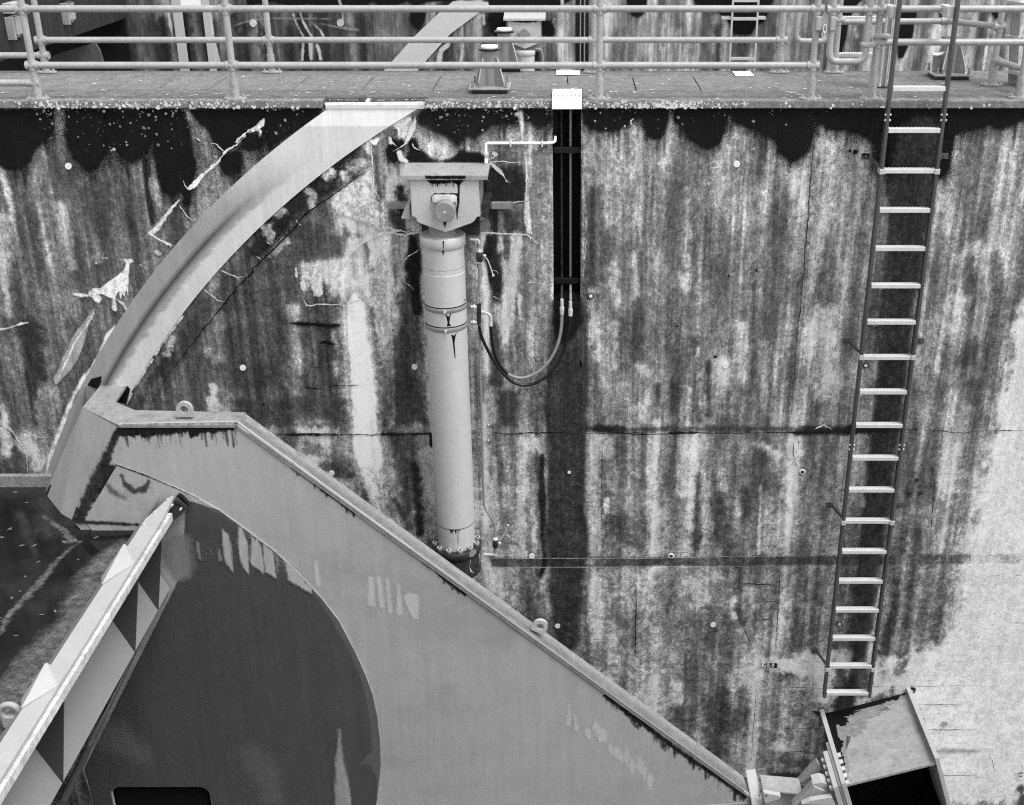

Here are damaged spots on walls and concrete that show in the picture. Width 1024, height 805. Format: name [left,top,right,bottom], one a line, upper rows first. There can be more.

leakage [0,108,322,224]
leakage [46,326,115,473]
spalling [54,258,148,384]
leakage [127,315,184,403]
crack [145,116,421,406]
leakage [341,256,388,514]
leakage [406,237,422,316]
leakage [480,219,523,338]
leakage [538,293,589,649]
crack [481,125,1021,568]
leakage [582,108,1024,715]